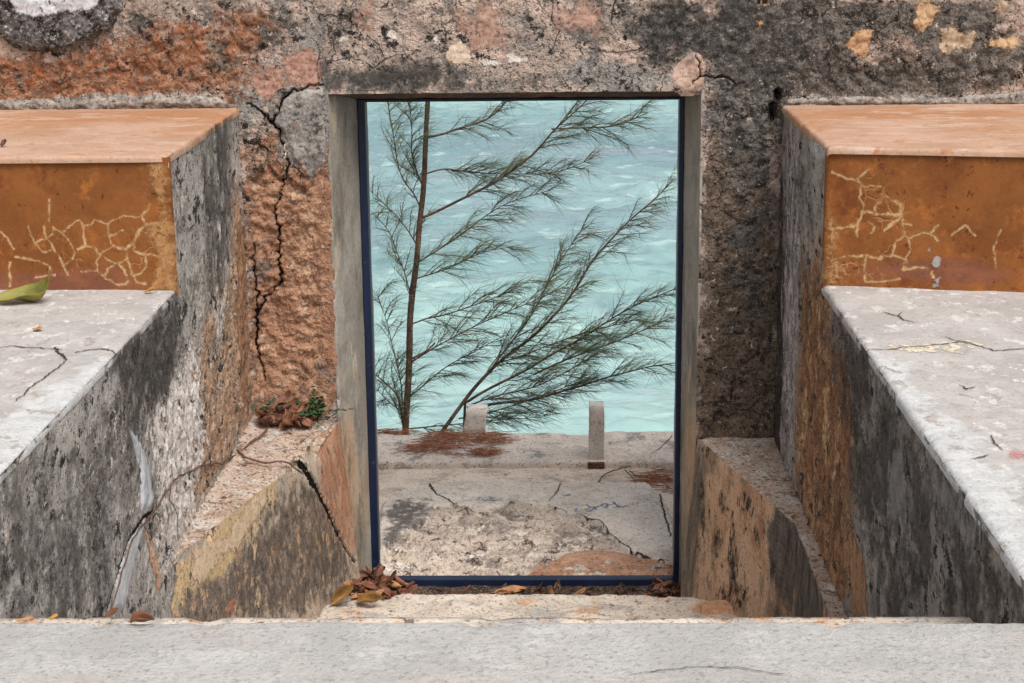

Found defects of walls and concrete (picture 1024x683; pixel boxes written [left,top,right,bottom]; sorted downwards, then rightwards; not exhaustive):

crack [692,55,736,84]
crack [0,193,167,287]
crack [243,41,324,380]
crack [829,170,1002,283]
crack [0,345,116,401]
crack [866,312,1024,373]
crack [297,459,355,563]
crack [549,483,672,562]